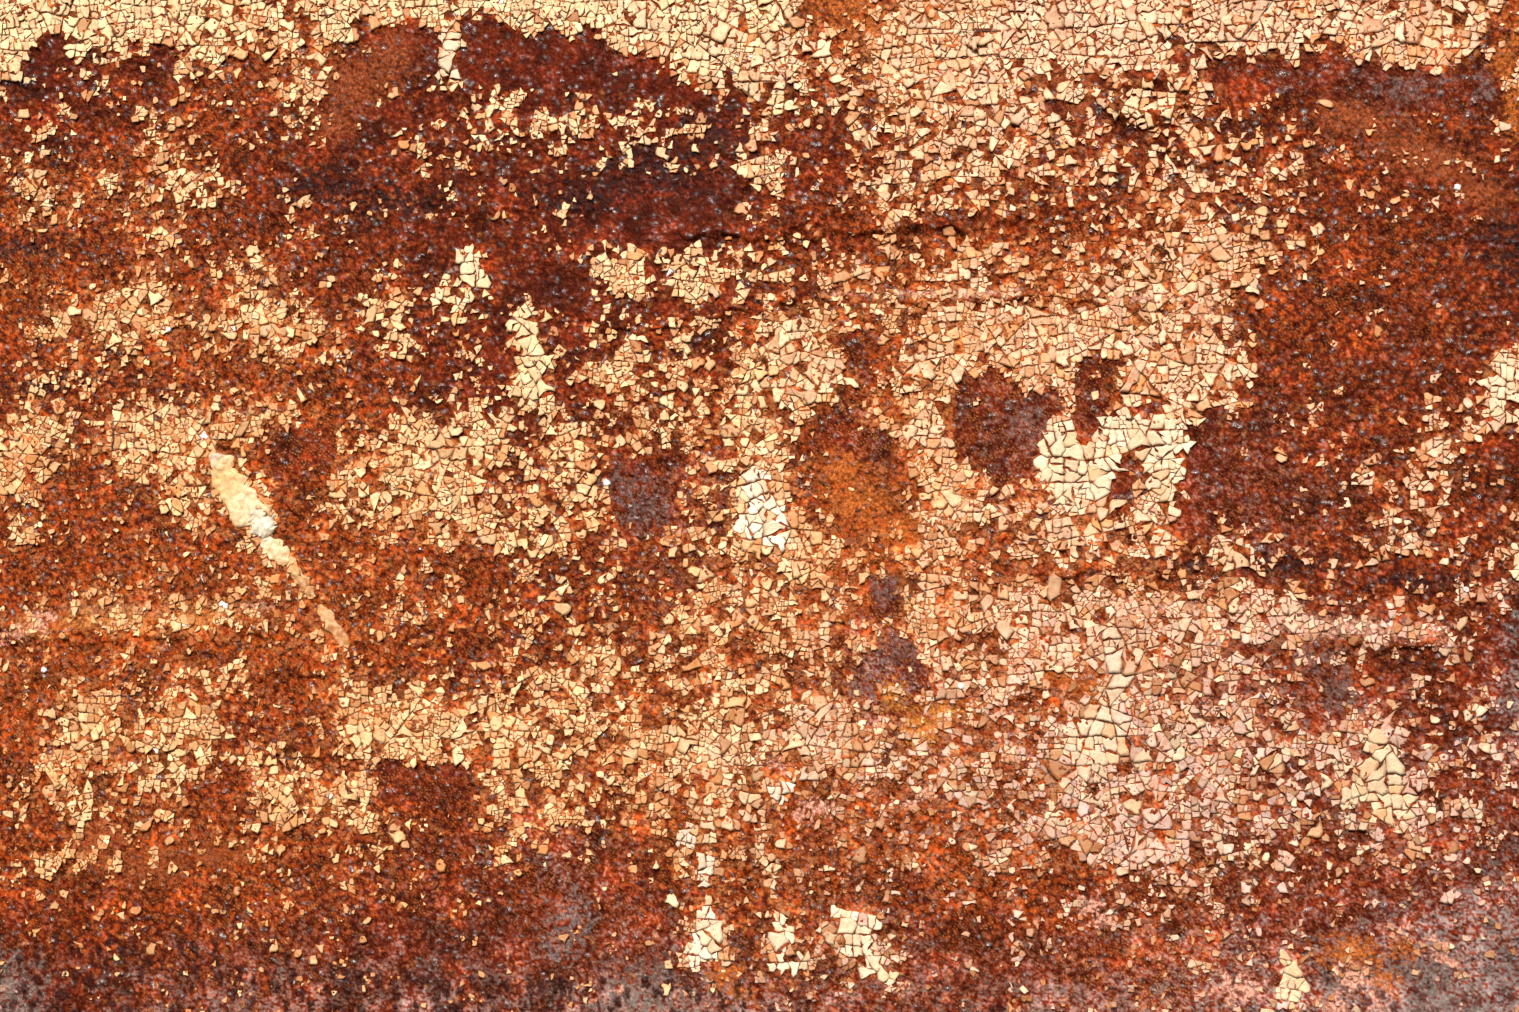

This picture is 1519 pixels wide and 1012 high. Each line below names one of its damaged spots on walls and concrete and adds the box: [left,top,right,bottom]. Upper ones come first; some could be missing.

corrosion [194,0,427,144]
crack [888,30,1034,59]
crack [1229,0,1274,51]
peeling [1,92,87,242]
peeling [390,84,720,180]
crack [111,415,130,464]
corrosion [0,91,518,900]
corrosion [477,26,1325,1012]
peeling [364,561,472,653]
peeling [1452,536,1519,626]
crack [88,669,140,698]
corrosion [1317,932,1481,1012]